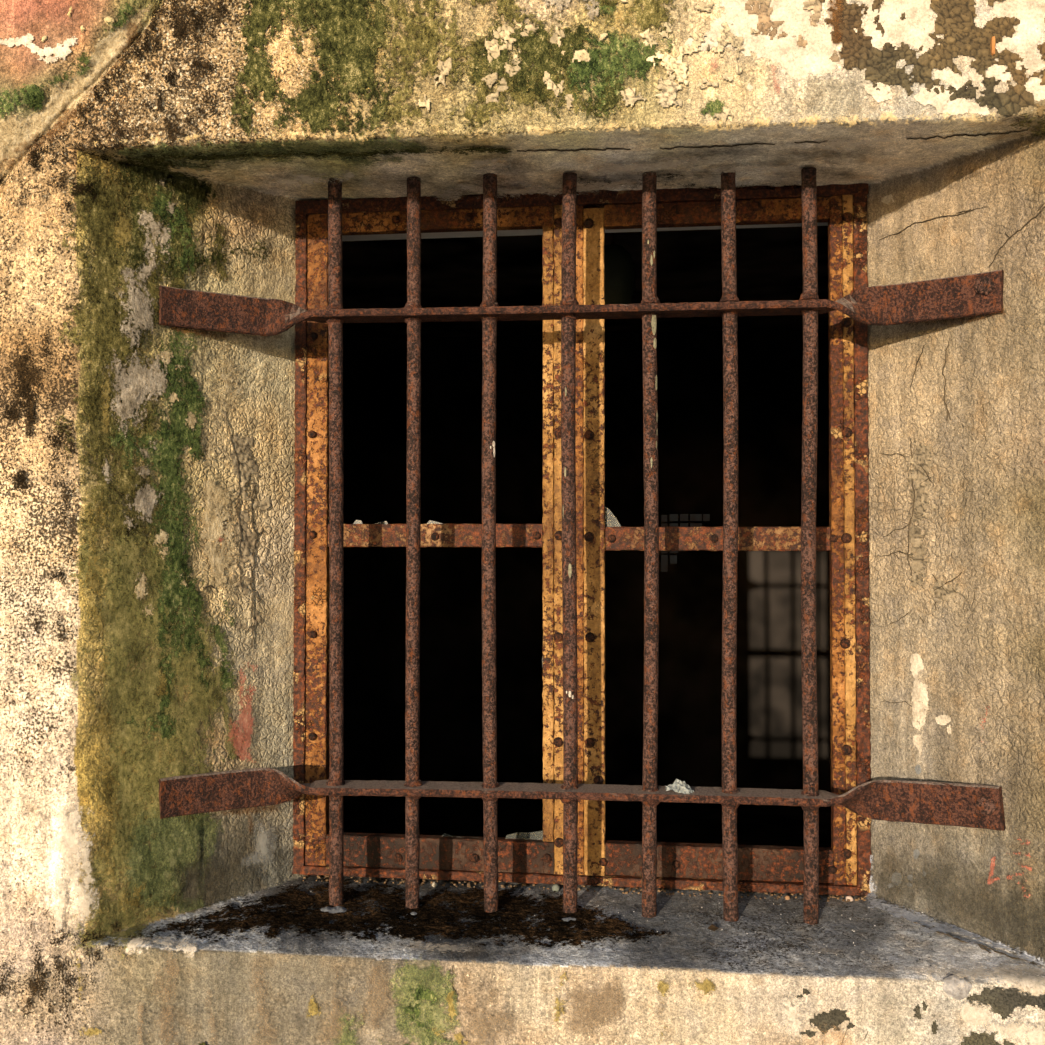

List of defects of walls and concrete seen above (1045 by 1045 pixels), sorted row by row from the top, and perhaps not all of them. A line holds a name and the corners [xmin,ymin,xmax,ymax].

peeling [620,0,1045,118]
crack [879,206,988,240]
crack [989,203,1045,266]
leakage [182,374,205,461]
crack [910,341,951,421]
crack [879,438,962,624]
leakage [195,600,237,767]
peeling [910,653,951,775]
leakage [410,941,469,952]
leakage [867,855,1045,996]
peeling [799,1008,855,1038]
peeling [943,974,1045,1045]